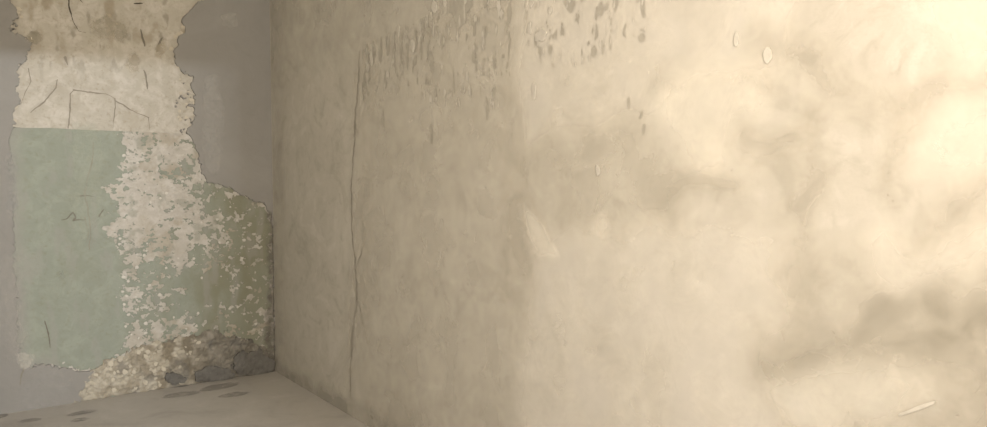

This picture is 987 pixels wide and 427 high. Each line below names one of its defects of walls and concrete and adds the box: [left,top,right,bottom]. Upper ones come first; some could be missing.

crack [21,56,150,130]
crack [140,29,163,89]
leakage [521,0,616,136]
leakage [615,0,788,96]
peeling [6,0,274,403]
crack [350,55,363,400]
leakage [853,265,987,387]